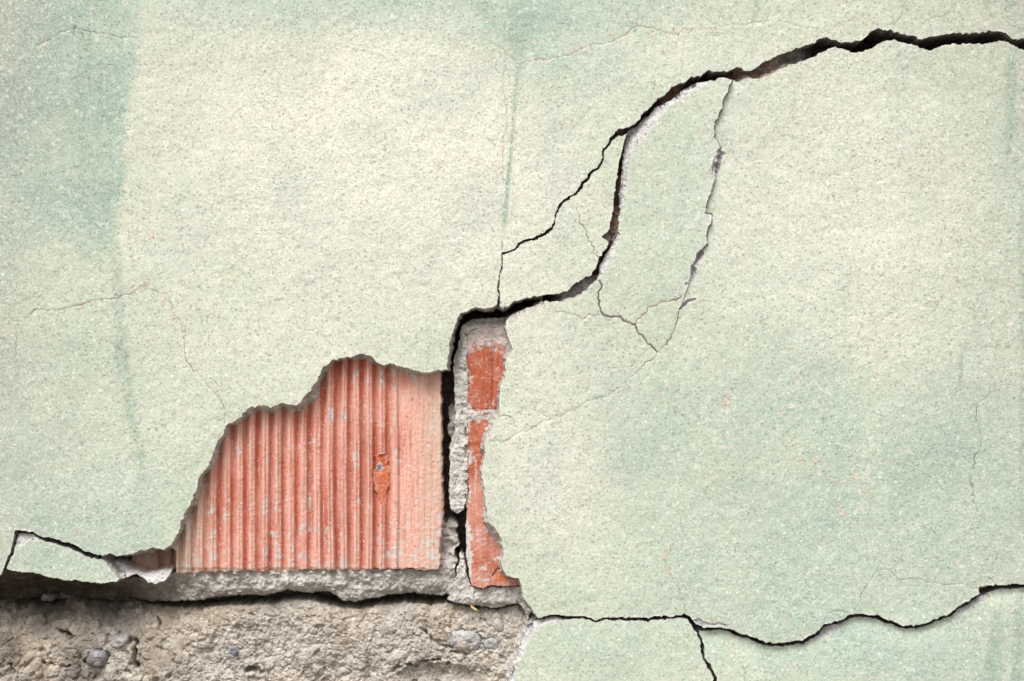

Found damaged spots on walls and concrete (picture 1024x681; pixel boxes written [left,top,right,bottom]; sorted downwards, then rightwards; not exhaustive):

crack [443,28,1024,552]
spalling [1,296,564,681]
crack [3,530,104,571]
crack [158,589,448,602]
crack [531,584,1024,681]